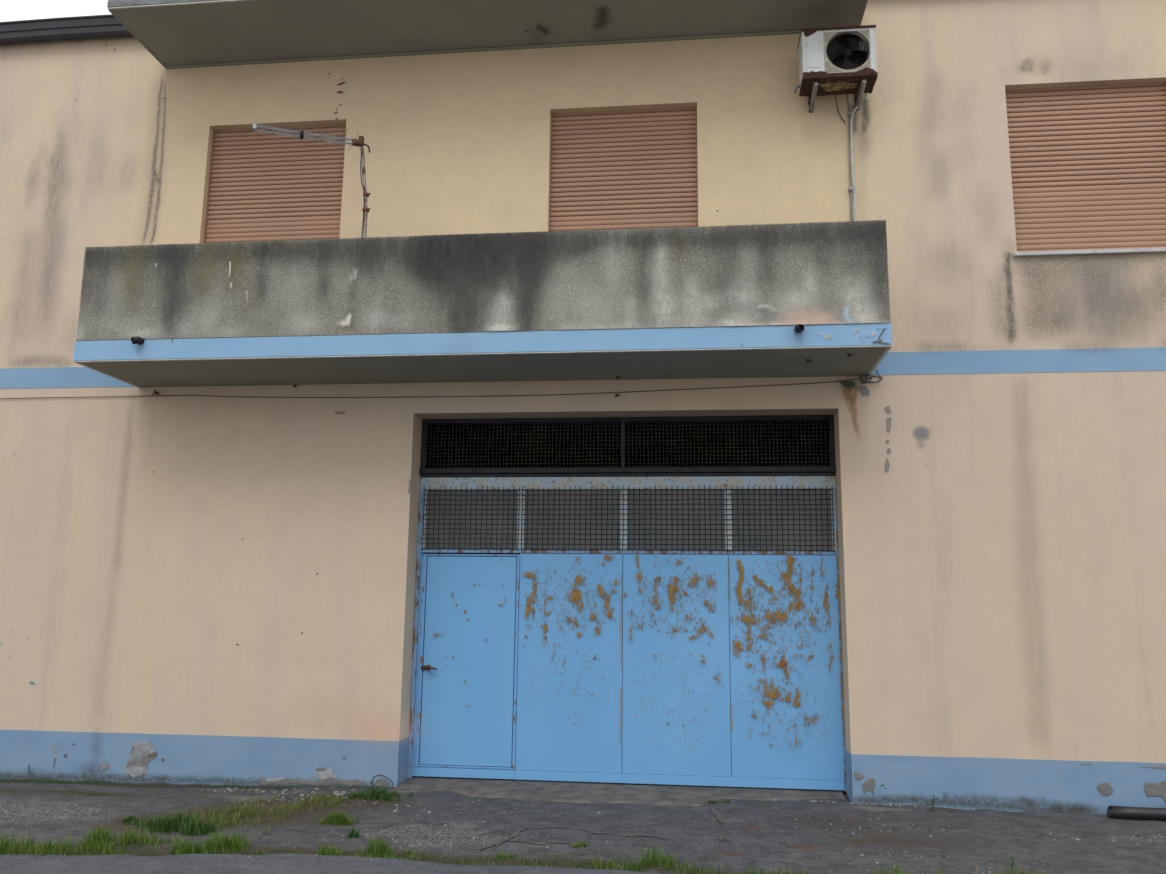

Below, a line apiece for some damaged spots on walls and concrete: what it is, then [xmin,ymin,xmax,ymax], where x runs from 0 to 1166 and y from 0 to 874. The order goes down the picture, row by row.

leakage [83,221,888,332]
rust [519,546,845,759]
spalling [126,741,164,778]
peeling [1144,764,1166,802]